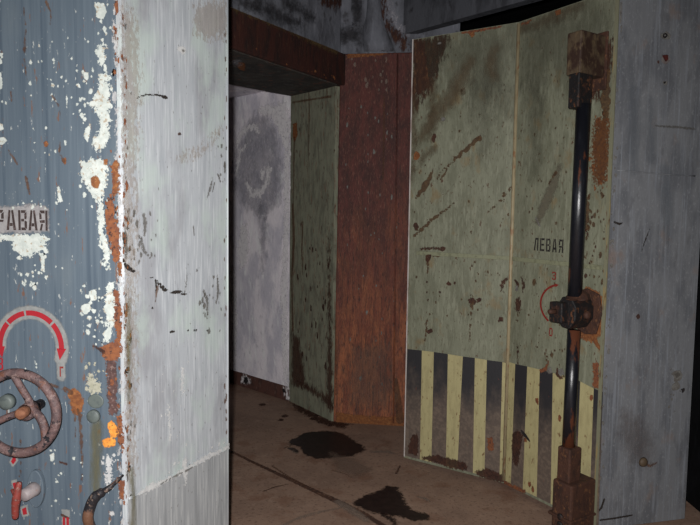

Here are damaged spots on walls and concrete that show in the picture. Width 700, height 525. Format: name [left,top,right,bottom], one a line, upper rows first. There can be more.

corrosion [381,0,451,114]
peeling [66,2,113,271]
corrosion [414,135,482,199]
corrosion [584,37,614,264]
peeling [0,233,59,290]
corrosion [290,123,404,429]
corrosion [92,289,136,510]
water stain [285,431,365,459]
water stain [354,486,429,525]
corrosion [422,454,526,493]